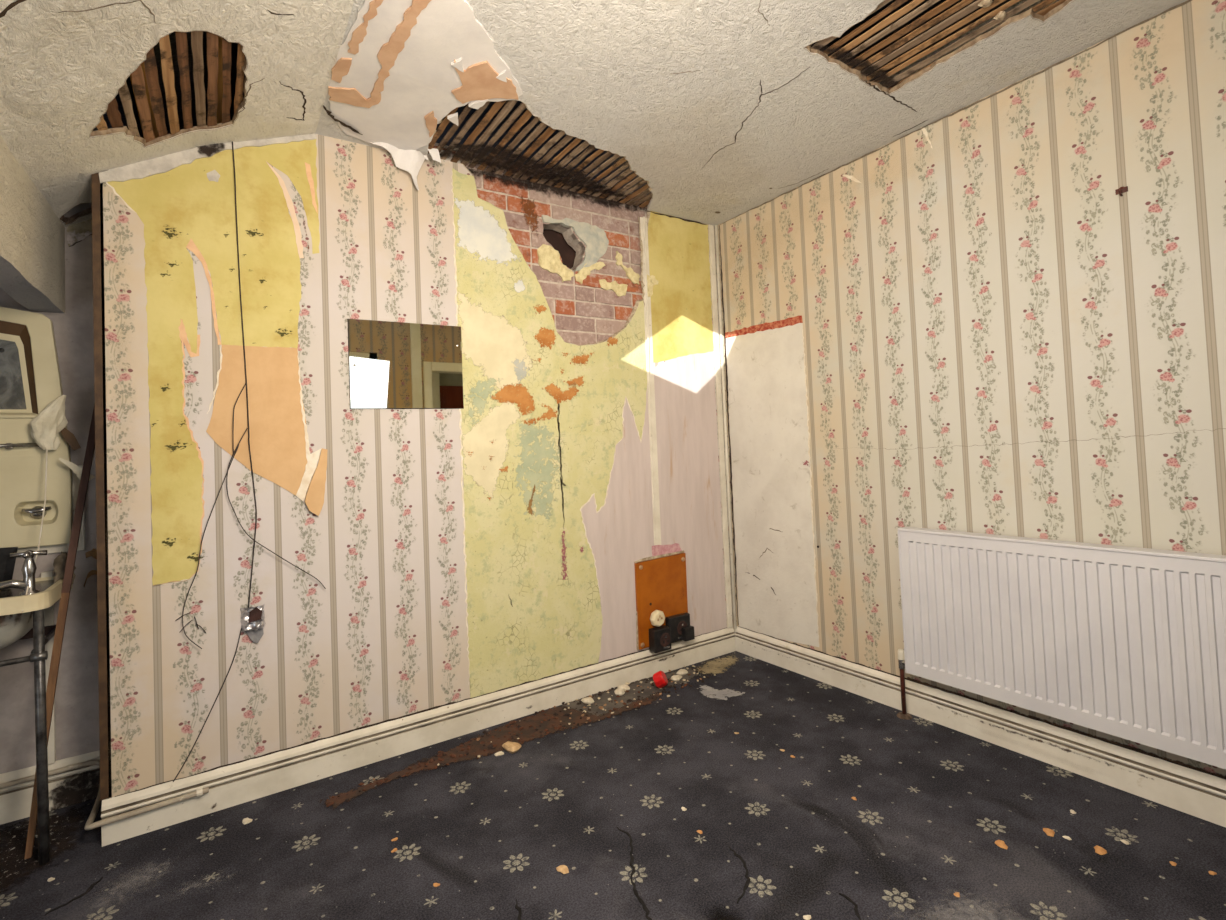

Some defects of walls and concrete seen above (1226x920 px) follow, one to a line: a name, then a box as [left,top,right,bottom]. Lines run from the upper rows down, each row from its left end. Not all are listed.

crack [58,0,155,22]
peeling [89,30,320,586]
peeling [428,100,714,698]
crack [115,0,1226,797]
flaking render [804,0,1075,95]